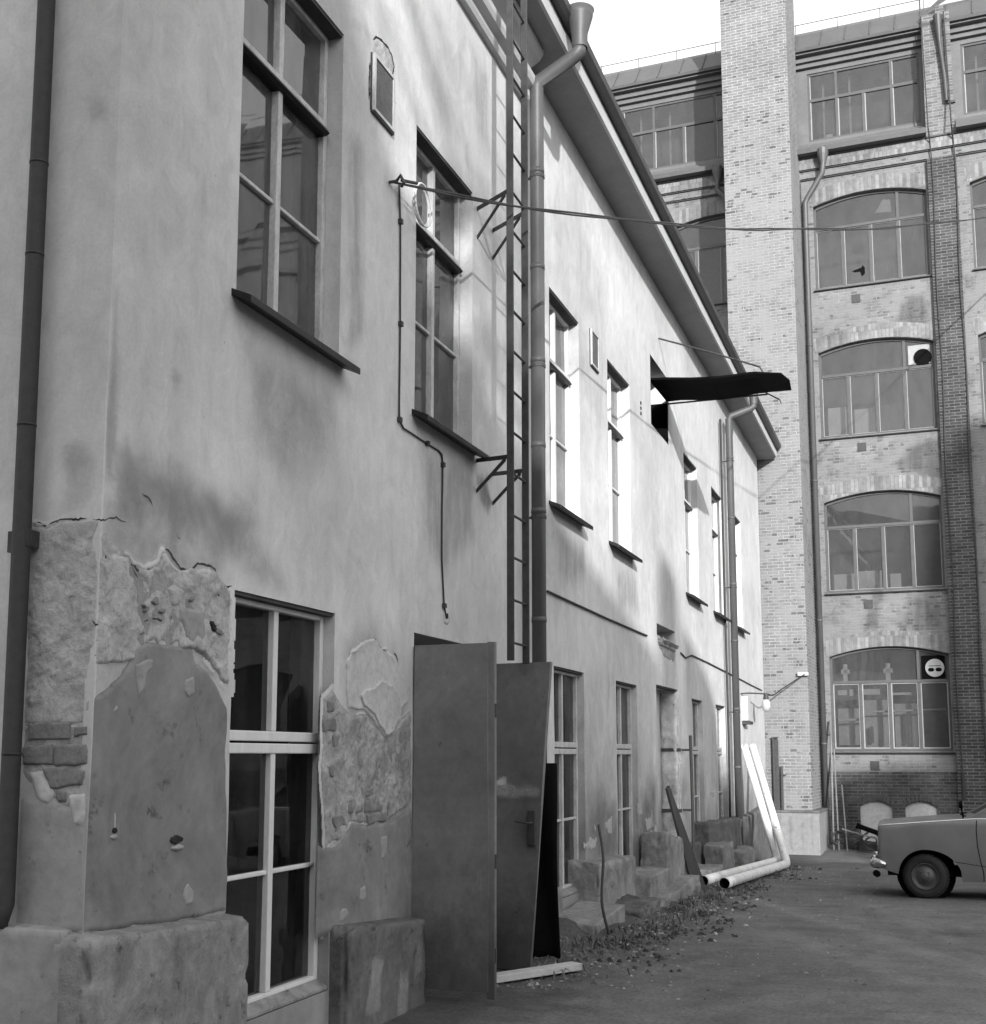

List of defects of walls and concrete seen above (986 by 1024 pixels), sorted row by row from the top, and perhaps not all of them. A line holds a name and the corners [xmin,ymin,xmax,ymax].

crack [35,516,127,527]
spalling [22,514,236,807]
spalling [316,638,412,849]